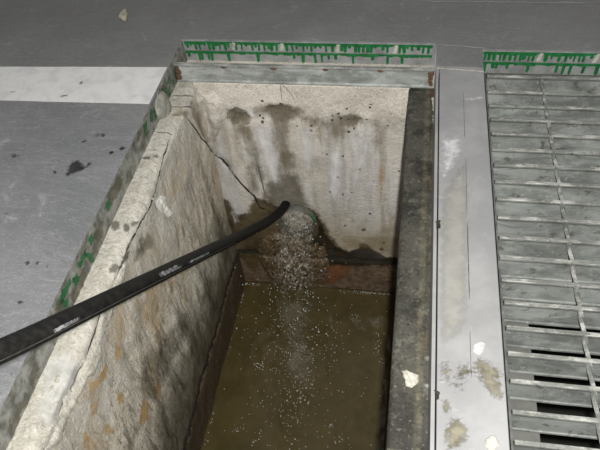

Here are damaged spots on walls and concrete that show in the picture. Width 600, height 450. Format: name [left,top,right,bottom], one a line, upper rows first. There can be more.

crack [113,132,172,282]
crack [172,95,270,212]
leakage [217,105,397,287]
crack [59,315,100,412]
leakage [444,419,467,449]
leakage [442,360,503,398]